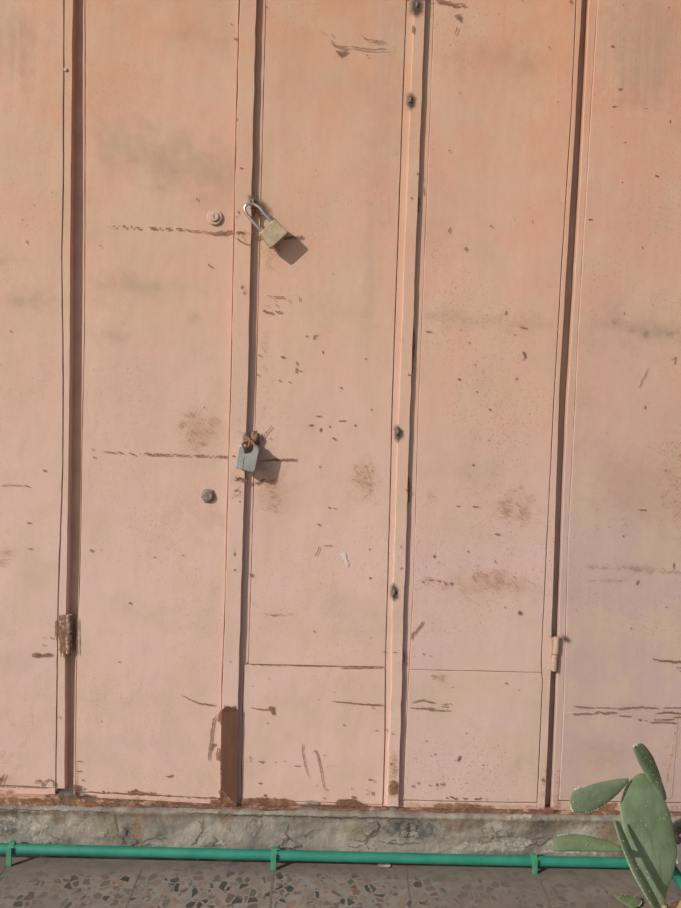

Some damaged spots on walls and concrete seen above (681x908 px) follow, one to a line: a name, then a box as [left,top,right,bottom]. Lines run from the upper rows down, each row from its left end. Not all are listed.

rust [108,225,262,245]
rust [92,412,235,458]
rust [32,619,66,658]
rust [573,706,681,780]
rust [0,774,220,819]
rust [225,794,379,820]
rust [388,755,618,829]
crack [0,808,165,846]
crack [177,812,419,850]